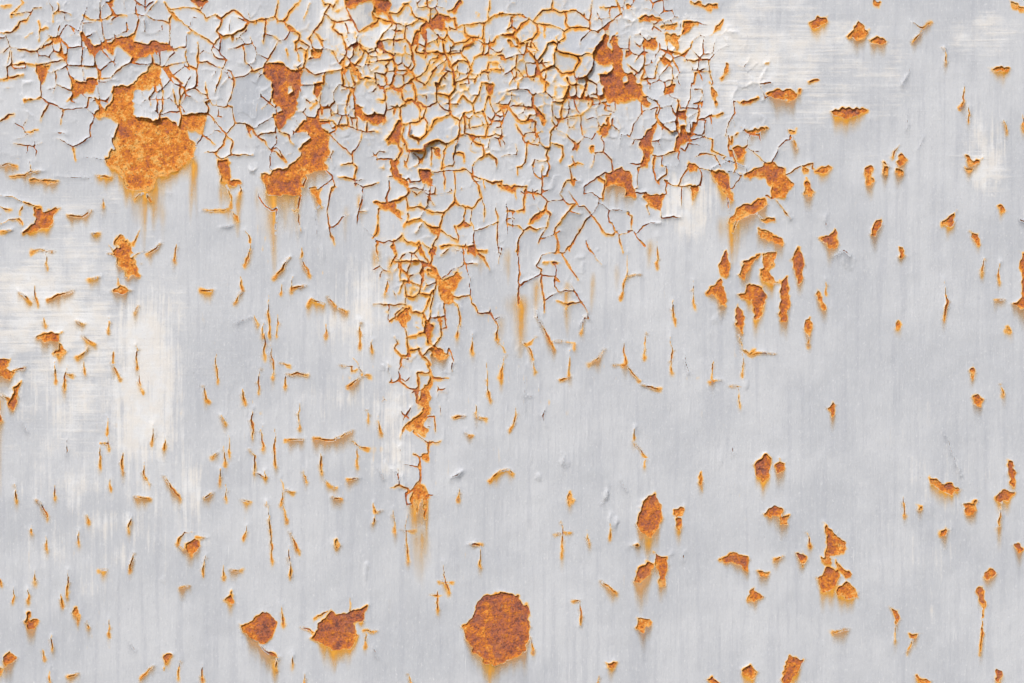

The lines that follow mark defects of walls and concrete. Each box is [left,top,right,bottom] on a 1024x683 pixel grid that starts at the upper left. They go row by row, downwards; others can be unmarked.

crack [0,160,175,240]
corrosion [66,31,207,299]
corrosion [257,57,333,244]
peeling [0,0,749,546]
corrosion [571,0,728,155]
corrosion [672,110,841,340]
peeling [743,128,792,164]
crack [0,184,419,683]
crack [447,465,517,505]
crack [451,277,699,441]
crack [551,425,650,561]
corrosion [459,588,534,681]